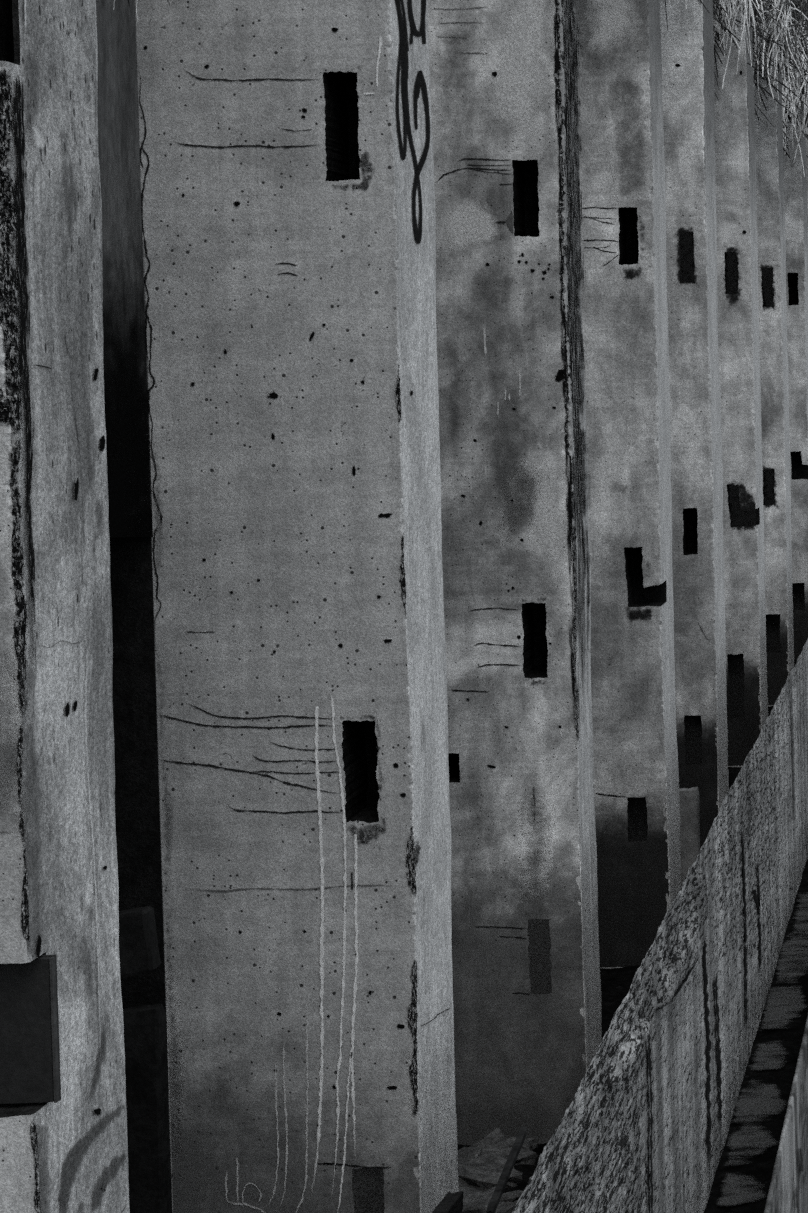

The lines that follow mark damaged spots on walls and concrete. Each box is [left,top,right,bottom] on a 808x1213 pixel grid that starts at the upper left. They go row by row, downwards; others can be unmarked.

crack [186,71,313,81]
crack [176,129,316,148]
crack [277,262,298,276]
crack [139,86,163,645]
spalling [0,69,43,958]
crack [159,704,338,814]
spalling [30,1119,42,1213]